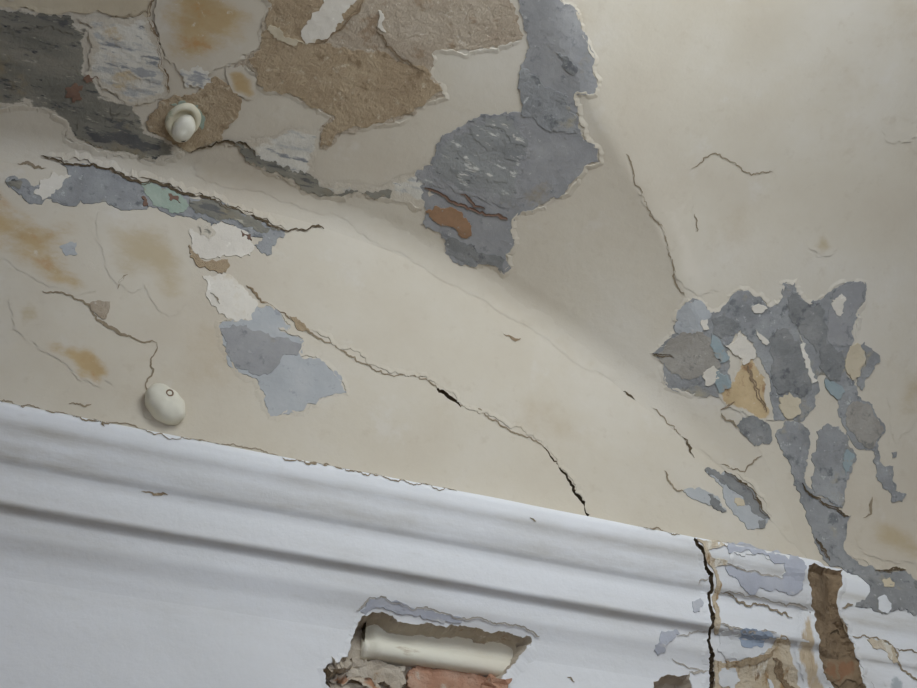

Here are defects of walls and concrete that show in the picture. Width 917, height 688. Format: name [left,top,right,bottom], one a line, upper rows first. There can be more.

leakage [154,0,265,100]
peeling [0,0,604,279]
leakage [0,187,194,317]
crack [628,155,684,294]
crack [43,274,158,390]
crack [1,399,454,491]
peeling [214,285,350,422]
crack [290,316,592,516]
peeling [649,278,917,688]
flaking render [317,596,539,688]
crack [644,527,728,688]
crack [840,618,917,681]